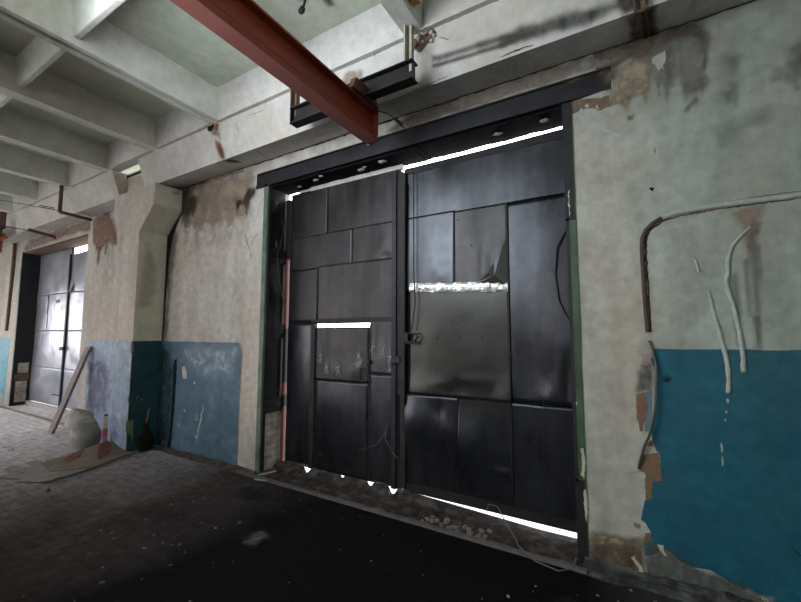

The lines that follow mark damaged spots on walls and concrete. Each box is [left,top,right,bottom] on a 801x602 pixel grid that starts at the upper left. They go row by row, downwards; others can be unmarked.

damp [389,22,708,131]
flaking render [571,51,666,115]
corrosion [212,122,241,163]
damp [182,174,254,244]
peeling [636,390,663,500]